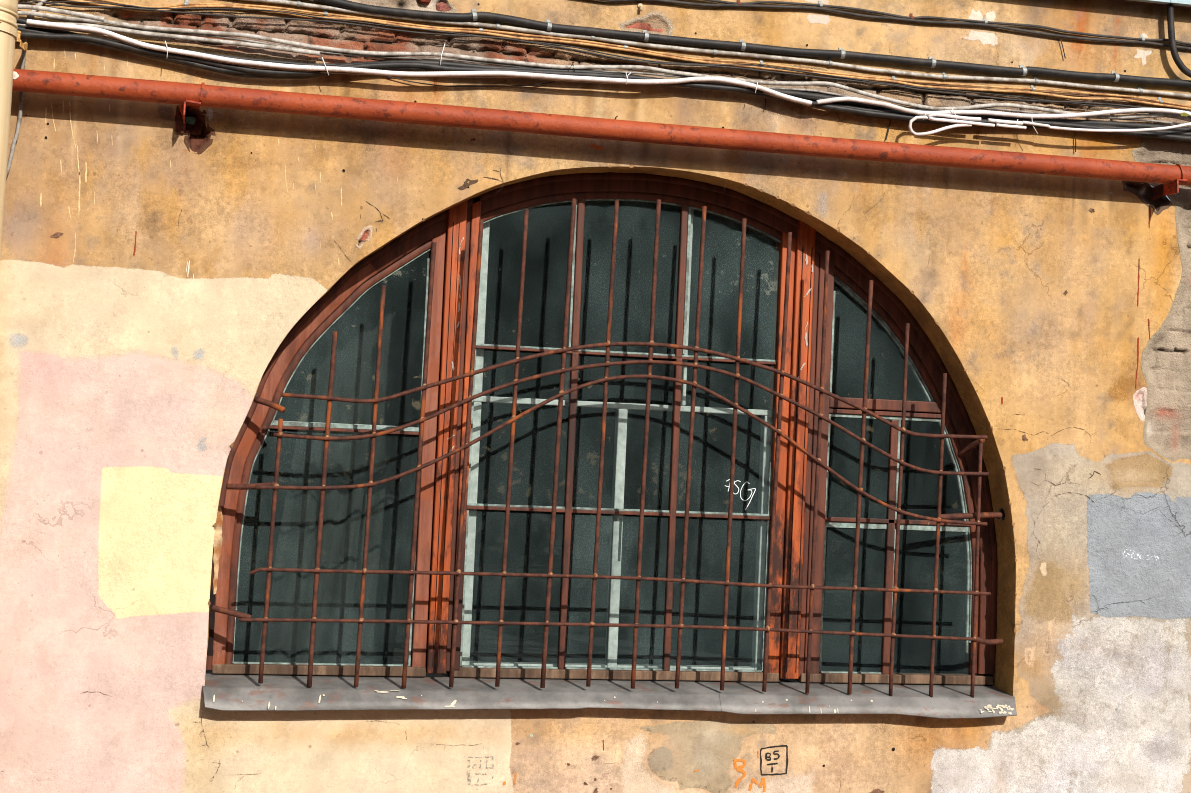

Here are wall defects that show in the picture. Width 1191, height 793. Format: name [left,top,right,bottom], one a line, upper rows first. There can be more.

flaking render [348,0,458,13]
peeling [805,0,831,25]
flaking render [88,8,1191,127]
flaking render [1132,139,1191,166]
flaking render [931,181,1191,793]